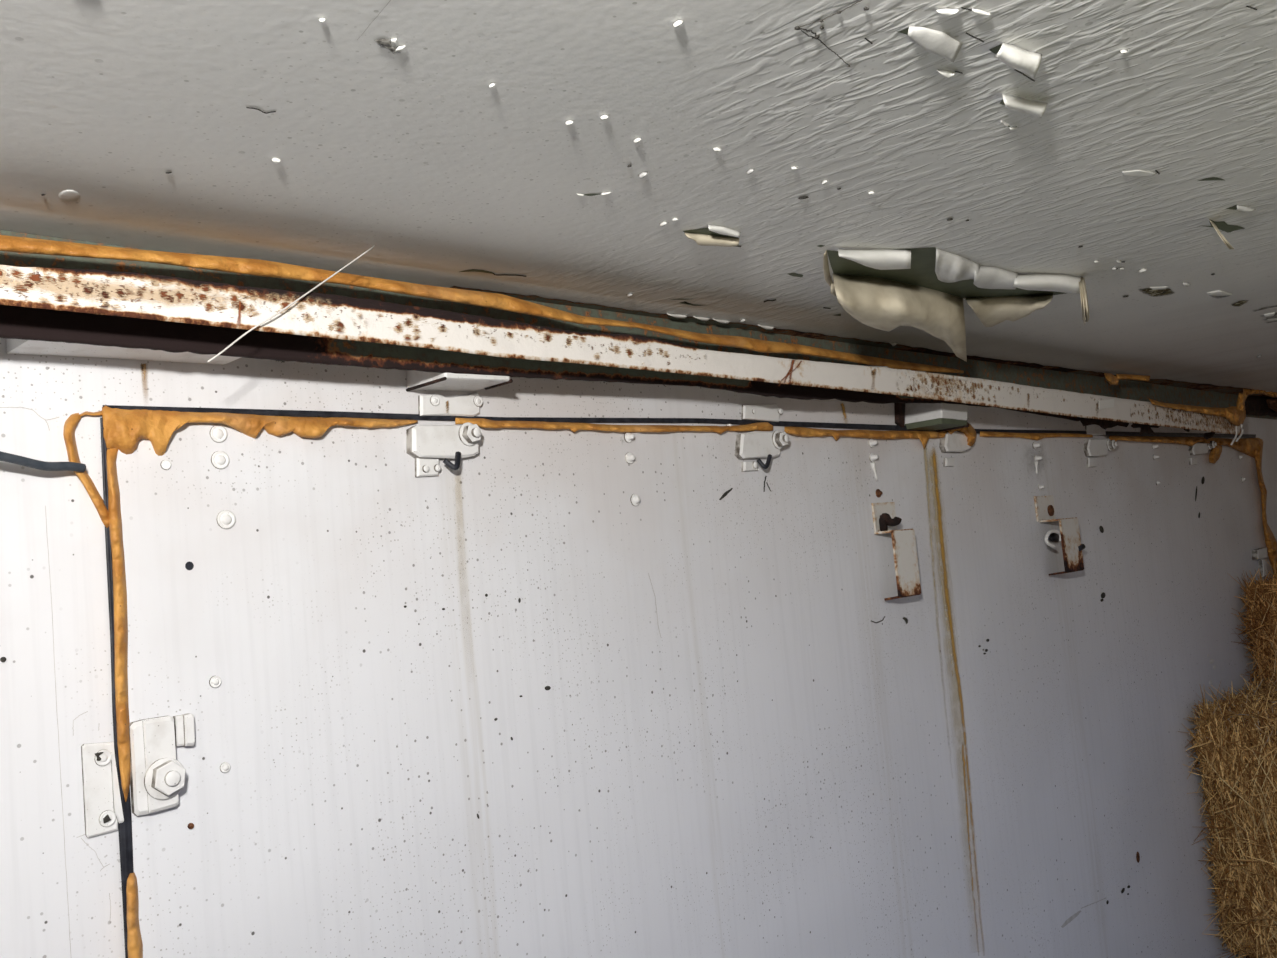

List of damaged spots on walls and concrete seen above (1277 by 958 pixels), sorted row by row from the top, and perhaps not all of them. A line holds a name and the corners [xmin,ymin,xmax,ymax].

peeling [936,7,991,17]
crack [794,0,873,67]
peeling [897,26,963,79]
peeling [990,43,1042,82]
peeling [1000,94,1047,130]
peeling [660,218,741,247]
corrosion [0,269,700,365]
peeling [450,245,1277,398]
corrosion [406,377,447,392]
corrosion [902,376,1044,402]
corrosion [1245,396,1277,417]